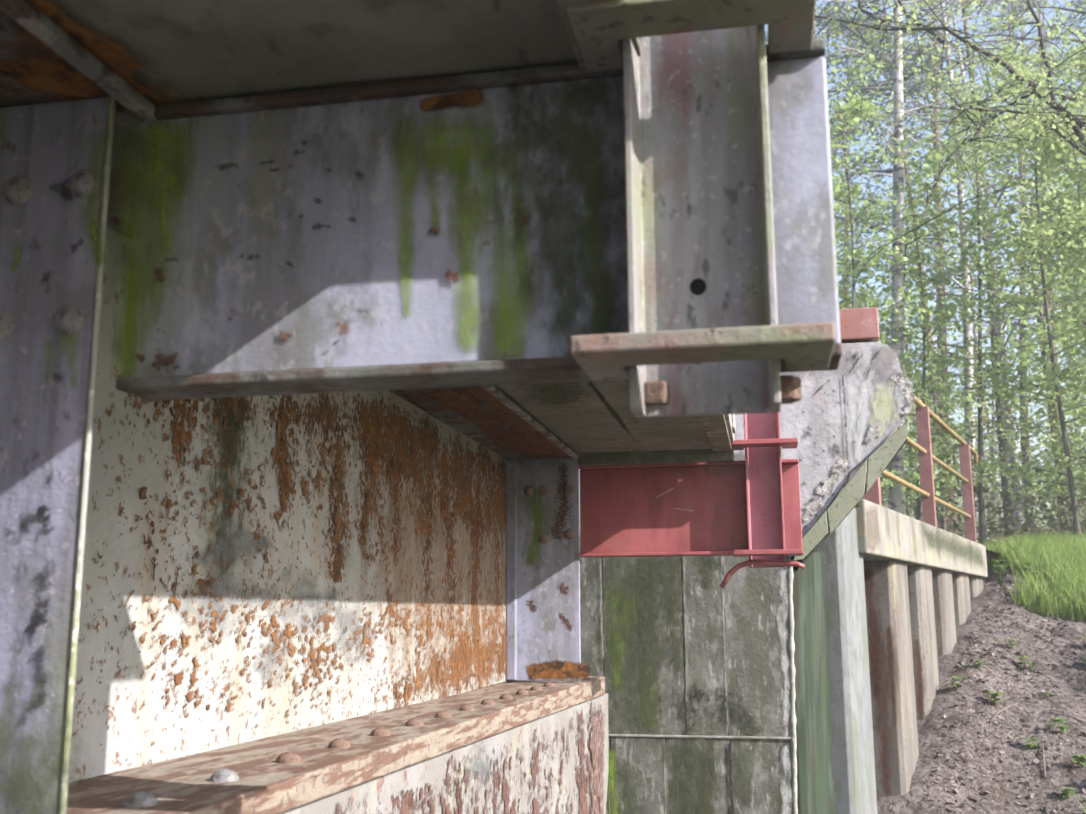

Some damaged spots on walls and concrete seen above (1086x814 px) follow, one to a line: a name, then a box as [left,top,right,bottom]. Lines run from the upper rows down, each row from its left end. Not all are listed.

rust [0,11,122,111]
rust [28,0,179,105]
leakage [398,134,411,315]
leakage [453,81,627,356]
rust [125,386,573,709]
peeling [337,703,603,814]
rust [527,660,590,680]
leakage [608,751,638,814]
leakage [640,556,724,727]
leakage [663,592,760,814]